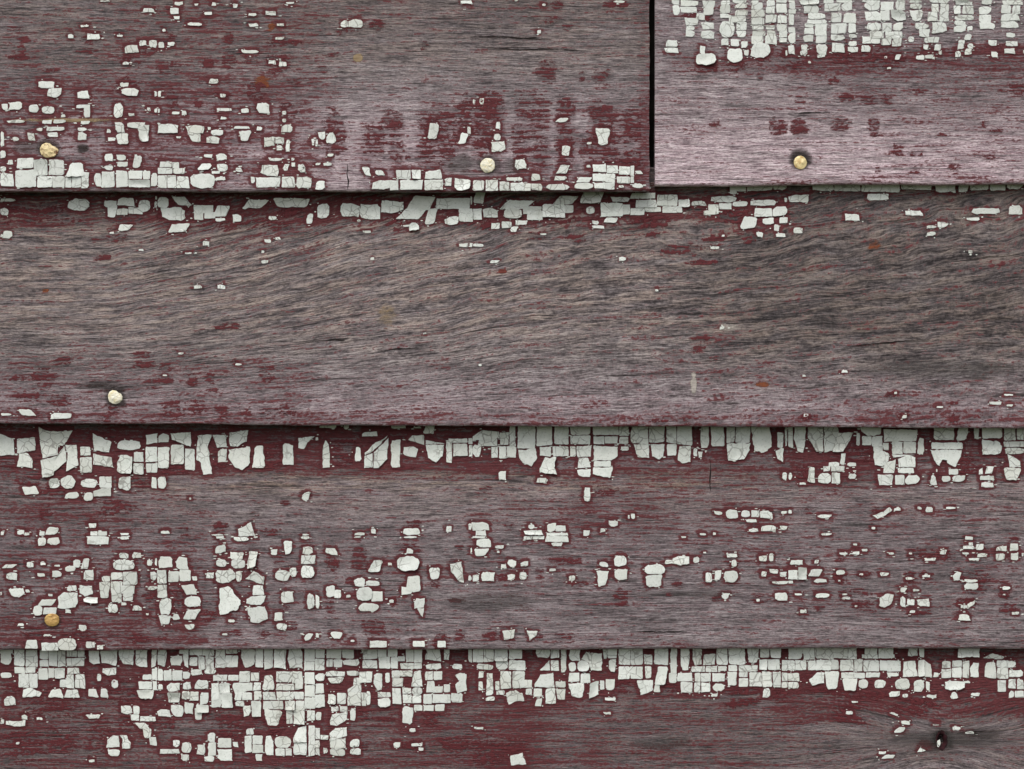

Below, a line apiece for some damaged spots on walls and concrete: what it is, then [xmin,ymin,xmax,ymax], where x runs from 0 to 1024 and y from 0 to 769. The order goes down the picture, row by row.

peeling [68,1,297,66]
peeling [337,19,363,29]
peeling [664,0,1024,70]
peeling [0,79,1023,238]
peeling [0,409,265,501]
peeling [283,413,1024,501]
peeling [583,514,635,538]
peeling [714,508,792,533]
peeling [871,507,901,529]
peeling [0,522,1024,763]
peeling [510,753,526,765]